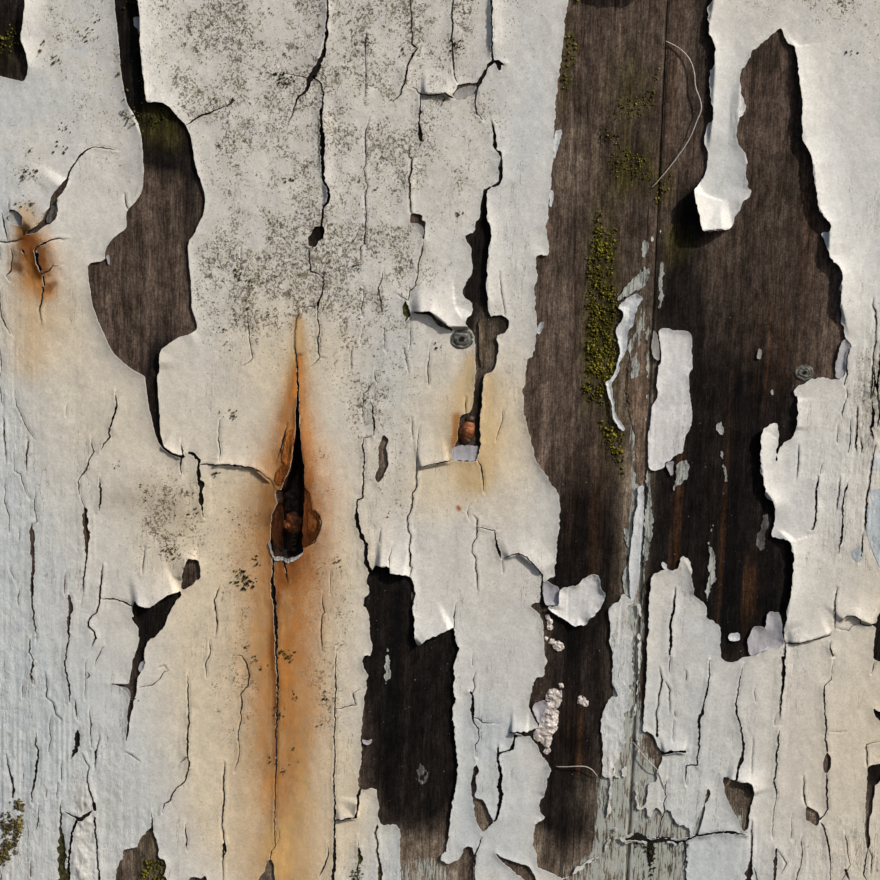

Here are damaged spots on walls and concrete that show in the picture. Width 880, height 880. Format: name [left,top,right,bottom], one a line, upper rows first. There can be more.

peeling [0,0,28,81]
corrosion [14,208,55,304]
peeling [88,0,205,458]
crack [392,0,504,213]
crack [0,214,132,880]
corrosion [251,319,313,880]
peeling [358,565,476,880]
corrosion [452,356,496,490]
peeling [496,0,851,880]
crack [625,588,874,880]
crack [797,299,880,562]
peeling [865,764,880,849]